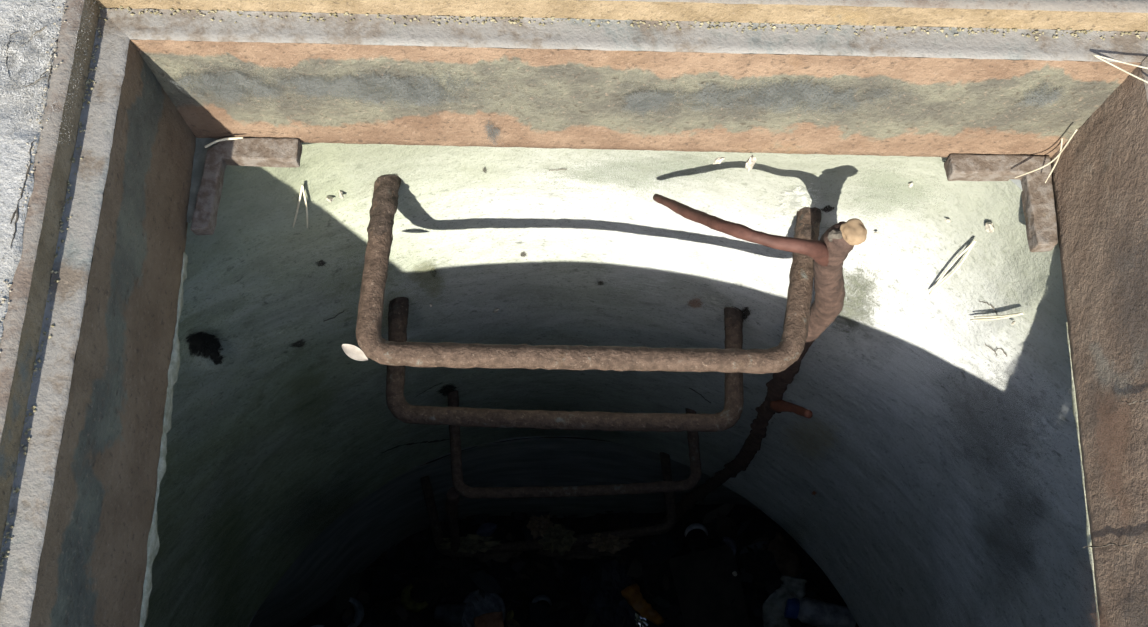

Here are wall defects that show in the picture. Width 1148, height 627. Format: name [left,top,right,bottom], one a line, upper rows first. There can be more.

rust [367,174,401,245]
rust [794,206,821,239]
rust [388,297,409,333]
rust [724,306,744,330]